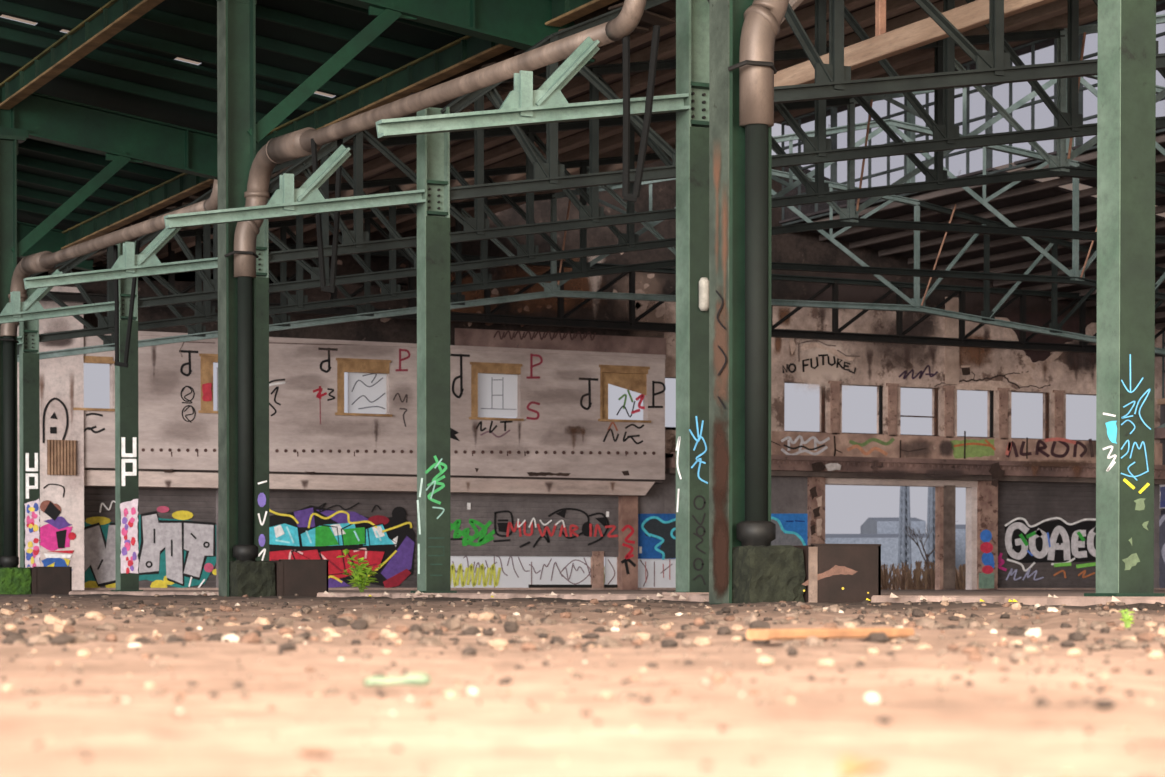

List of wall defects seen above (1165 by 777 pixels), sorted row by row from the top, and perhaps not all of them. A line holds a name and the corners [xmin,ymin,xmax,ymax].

water stain [809,273,900,323]
corrosion [714,302,728,402]
water stain [867,305,936,375]
water stain [1067,340,1097,378]
corrosion [713,419,729,593]